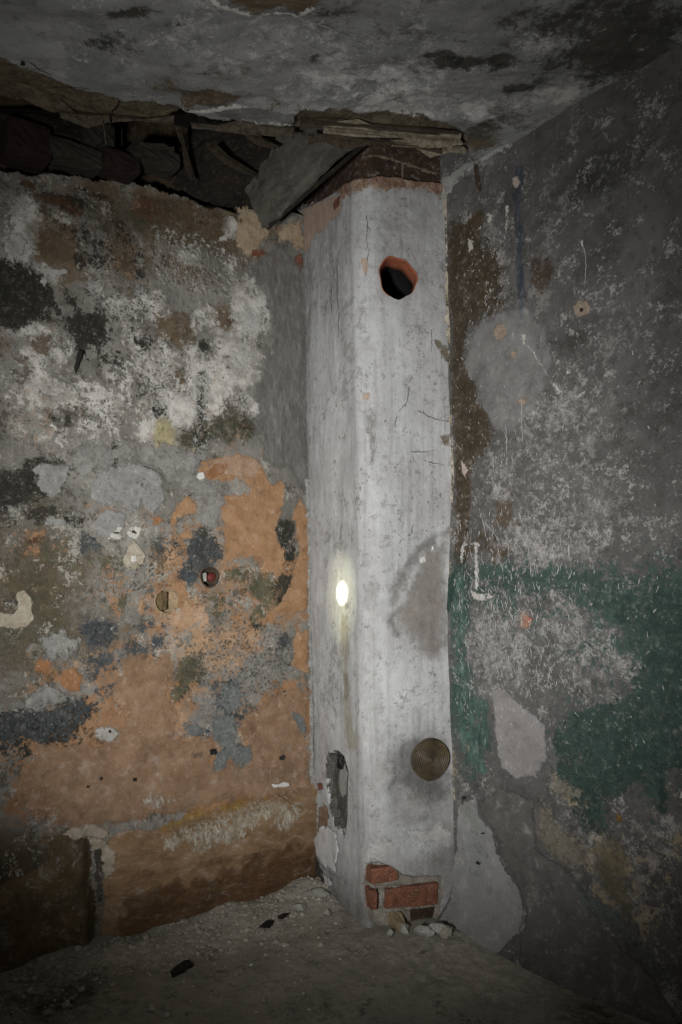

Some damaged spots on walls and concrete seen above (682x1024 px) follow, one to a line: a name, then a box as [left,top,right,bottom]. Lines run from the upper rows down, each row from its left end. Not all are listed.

flaking render [218,137,443,271]
water stain [0,259,55,331]
water stain [66,221,241,416]
water stain [161,371,255,449]
water stain [435,164,549,564]
water stain [394,539,443,657]
flaking render [22,440,349,906]
peeling [447,568,682,835]
flaking render [361,861,445,931]